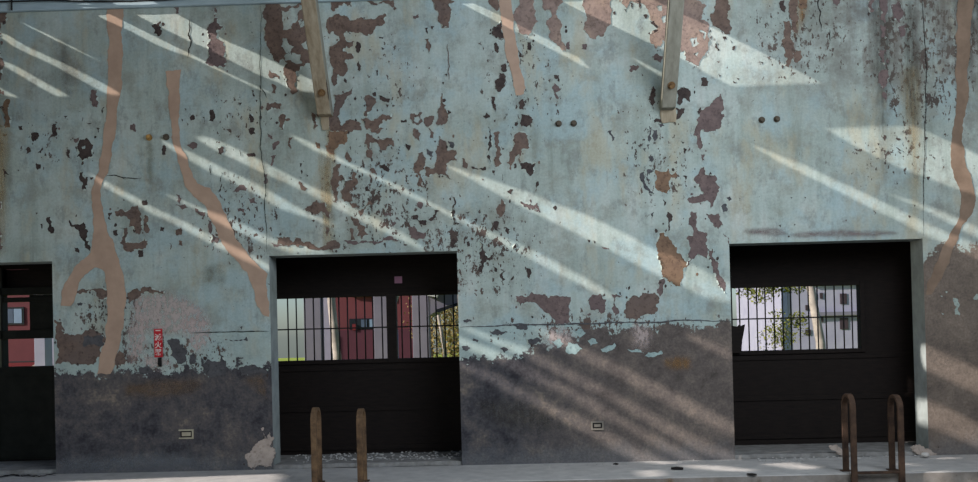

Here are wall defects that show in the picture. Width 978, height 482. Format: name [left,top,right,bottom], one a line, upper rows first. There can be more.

peeling [202,8,228,72]
peeling [513,0,570,57]
peeling [581,0,667,63]
peeling [680,0,735,66]
peeling [777,0,807,68]
peeling [248,3,310,184]
peeling [272,0,540,253]
peeling [587,77,740,357]
peeling [450,238,514,281]
peeling [54,319,106,366]
peeling [490,291,597,354]
spalling [243,427,276,470]